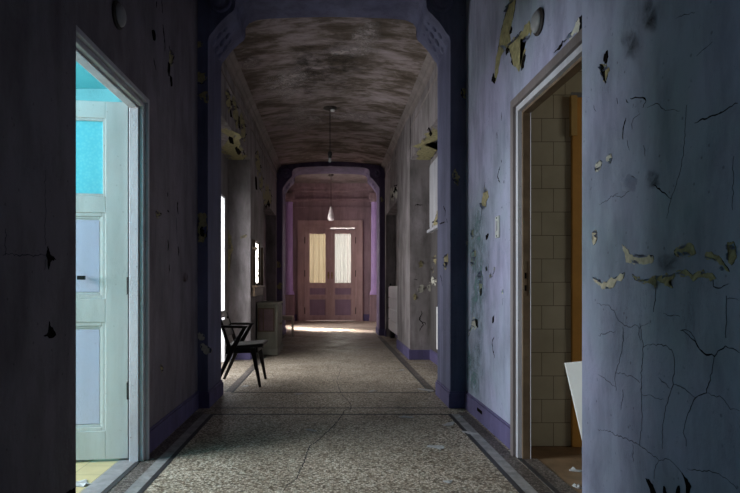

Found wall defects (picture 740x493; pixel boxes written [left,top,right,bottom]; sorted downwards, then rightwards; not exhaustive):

peeling [491,0,532,84]
spalling [554,15,582,53]
spalling [598,50,610,84]
peeling [413,126,438,160]
crack [617,97,738,215]
peeling [413,254,448,300]
peeling [592,241,737,312]
crack [598,296,739,489]
crack [283,372,352,491]